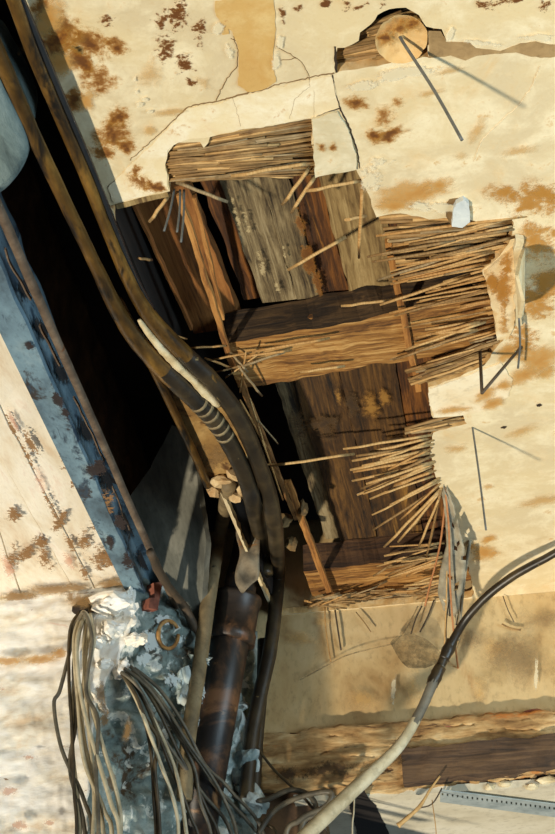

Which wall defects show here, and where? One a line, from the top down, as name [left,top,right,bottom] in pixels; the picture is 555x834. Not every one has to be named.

rust [42,10,127,111]
rust [90,107,135,159]
rust [154,0,206,86]
crack [130,36,360,169]
rust [344,96,406,144]
flaking render [428,31,555,61]
flaking render [484,246,525,341]
rust [51,392,93,442]
flaking render [428,362,513,417]
flaking render [72,586,148,680]
flaking render [261,721,409,796]
flaking render [365,708,555,794]